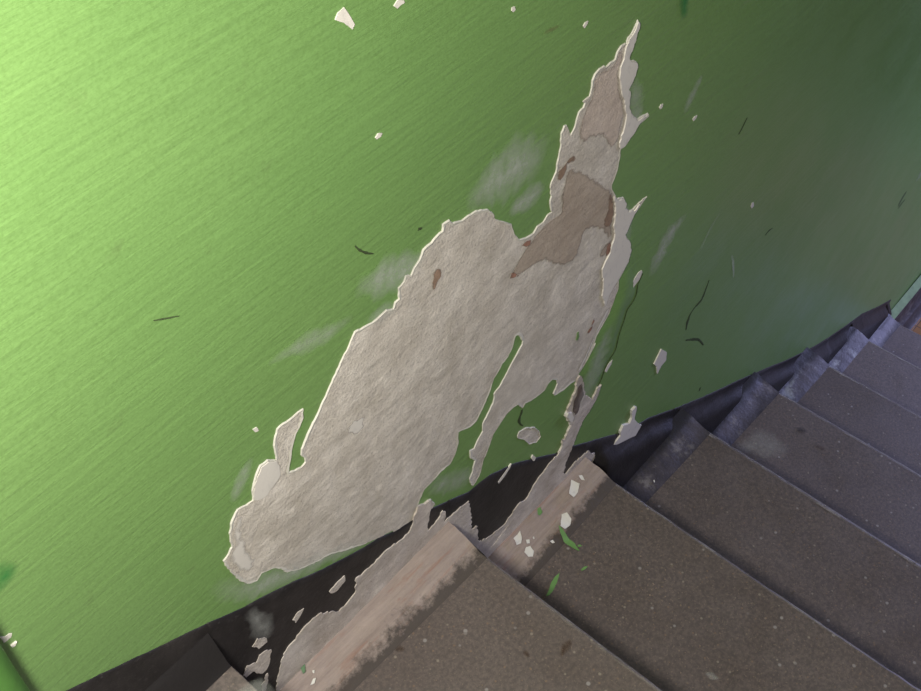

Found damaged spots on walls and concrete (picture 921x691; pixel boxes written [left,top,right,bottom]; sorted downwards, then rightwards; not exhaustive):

peeling [335,7,355,30]
spalling [223,20,649,691]